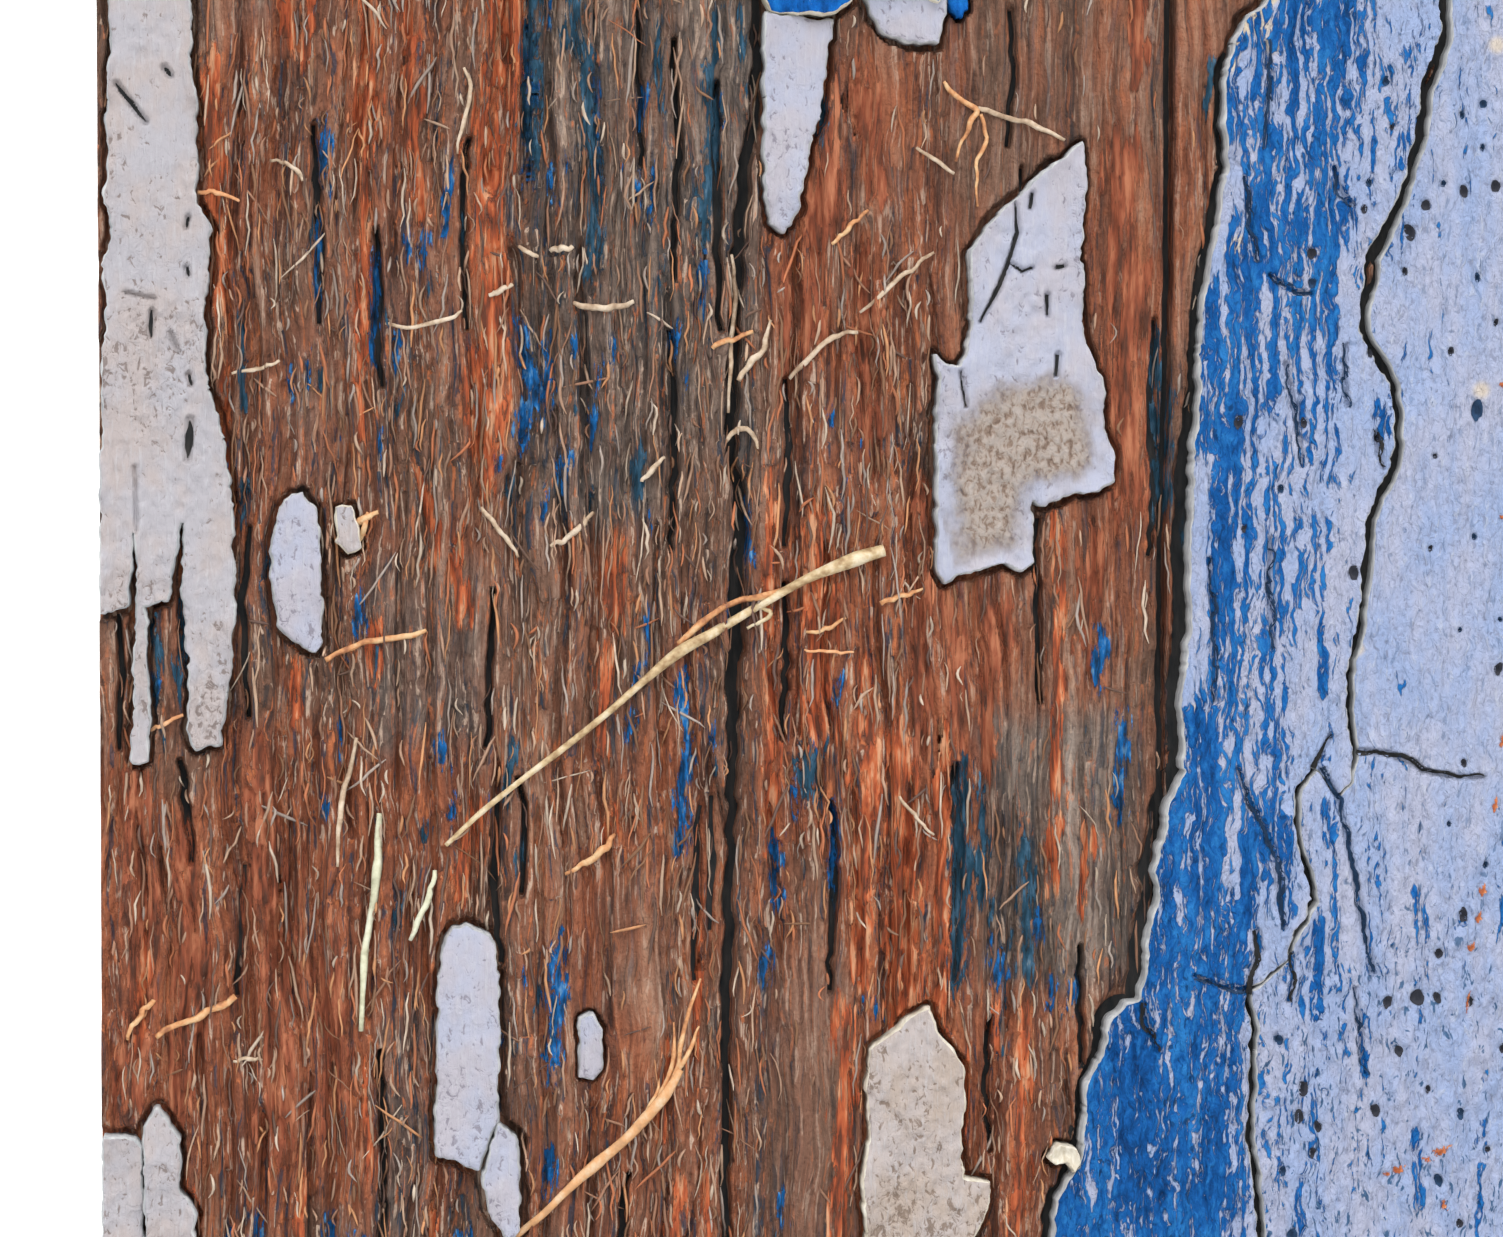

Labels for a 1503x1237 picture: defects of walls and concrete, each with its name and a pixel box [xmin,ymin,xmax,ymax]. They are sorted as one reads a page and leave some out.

peeling [759,0,968,234]
peeling [98,0,237,765]
peeling [930,141,1115,584]
peeling [269,492,362,653]
crack [1194,0,1484,1237]
peeling [101,1104,199,1237]
peeling [433,921,522,1237]
peeling [576,1009,604,1080]
peeling [859,1004,991,1237]